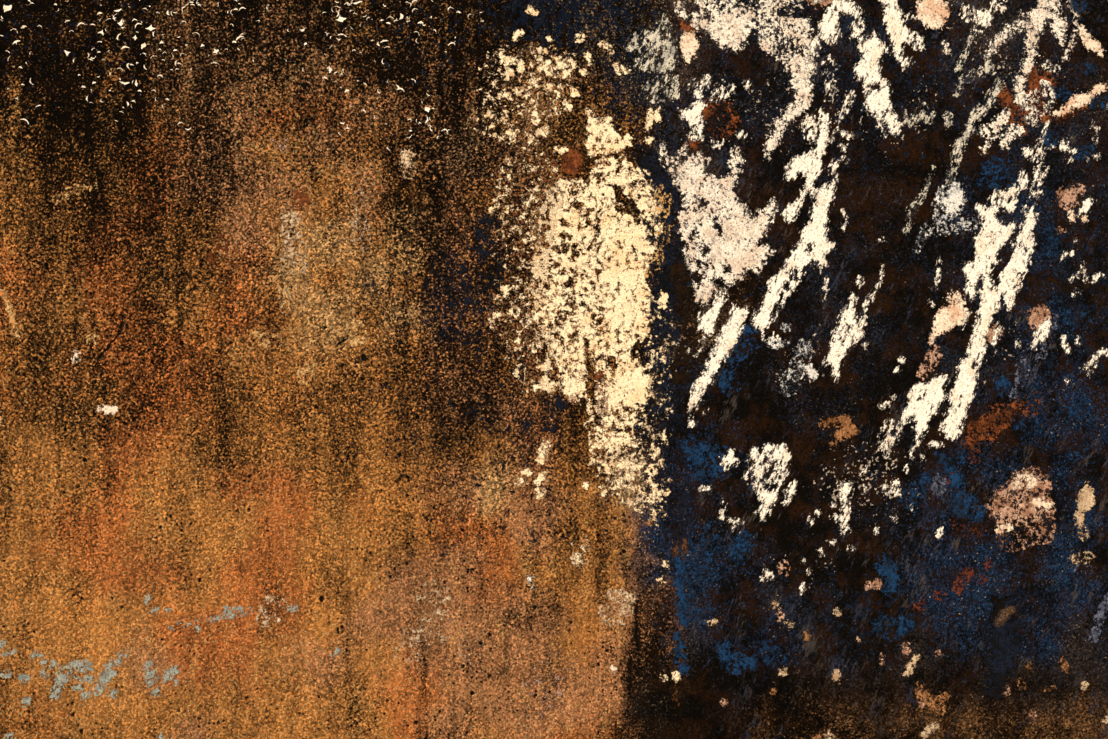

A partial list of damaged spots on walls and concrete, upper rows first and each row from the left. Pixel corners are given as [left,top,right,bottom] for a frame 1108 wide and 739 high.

water stain [399,147,416,179]
corrosion [533,144,584,182]
water stain [278,203,307,316]
water stain [330,189,373,260]
corrosion [572,346,609,417]